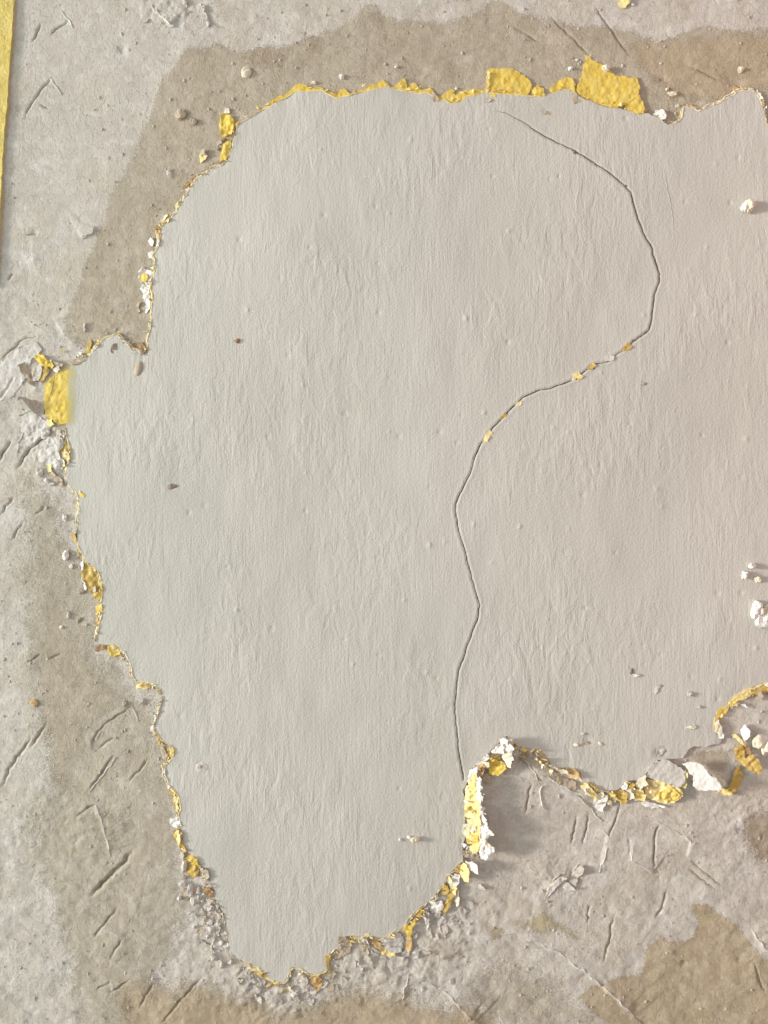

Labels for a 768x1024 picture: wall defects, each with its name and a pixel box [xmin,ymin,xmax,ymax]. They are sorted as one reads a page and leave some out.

peeling [550,55,647,114]
peeling [653,86,768,125]
flaking render [0,68,545,641]
crack [454,112,660,780]
hole [76,804,132,895]
peeling [92,644,768,1024]